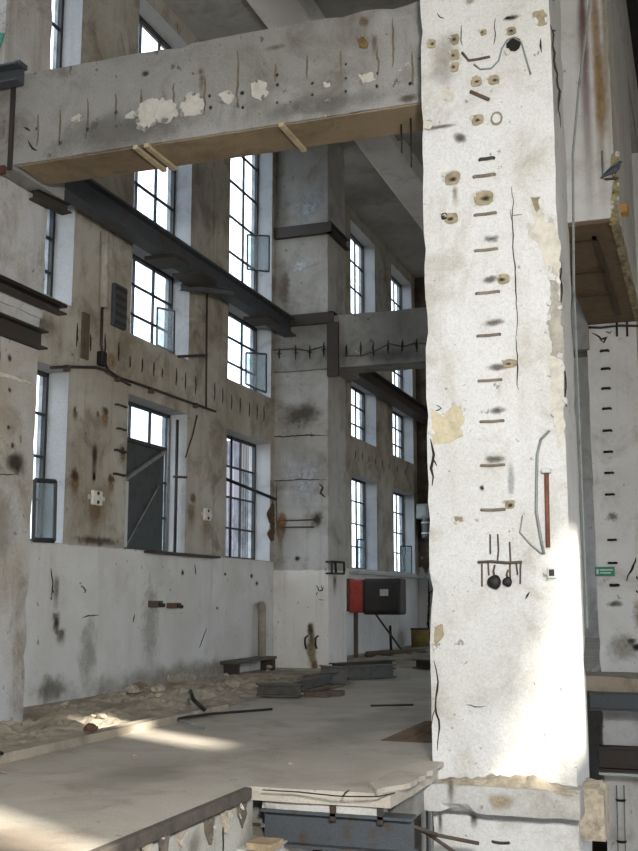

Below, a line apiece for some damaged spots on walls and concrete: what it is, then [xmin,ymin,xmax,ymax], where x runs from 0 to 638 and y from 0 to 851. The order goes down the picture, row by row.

peeling [123,91,205,133]
peeling [216,90,235,105]
peeling [251,78,271,101]
crack [539,25,562,127]
crack [0,372,31,383]
peeling [428,402,466,444]
crack [429,439,437,485]
crack [432,662,440,751]
spalling [133,830,187,851]
spalling [204,803,247,845]